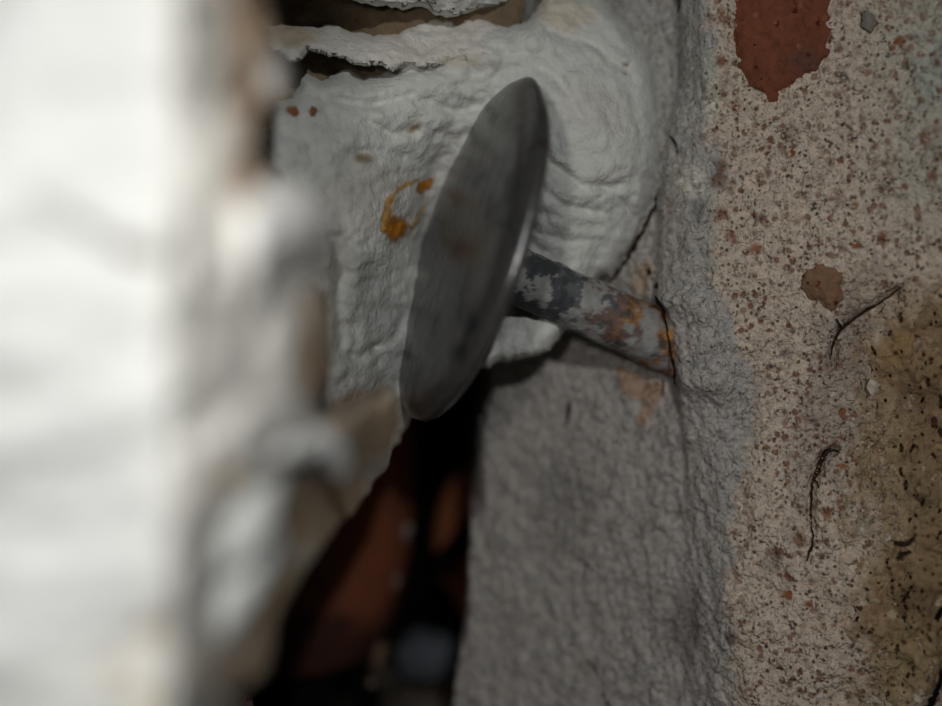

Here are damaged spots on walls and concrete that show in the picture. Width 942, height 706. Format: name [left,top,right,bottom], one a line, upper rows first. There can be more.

flaking render [731,0,831,102]
rust [380,178,433,242]
crack [607,186,660,284]
crack [806,448,839,561]
crack [927,607,942,639]
crack [925,663,942,706]